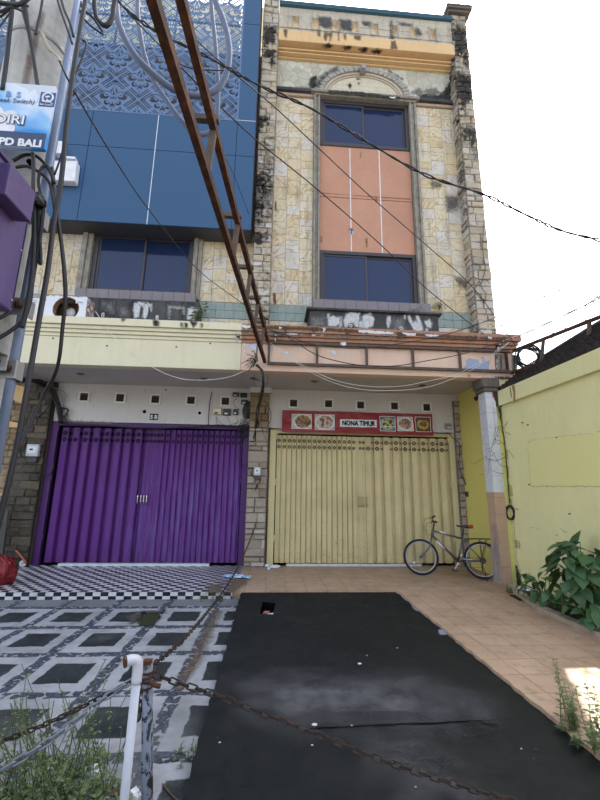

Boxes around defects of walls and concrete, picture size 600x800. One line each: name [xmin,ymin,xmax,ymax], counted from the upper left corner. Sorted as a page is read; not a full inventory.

damp [317,17,361,40]
damp [261,26,287,66]
damp [412,28,474,110]
damp [256,115,270,133]
damp [254,171,267,190]
damp [251,232,271,245]
peeling [133,302,152,318]
peeling [321,312,439,337]
crack [314,719,506,729]